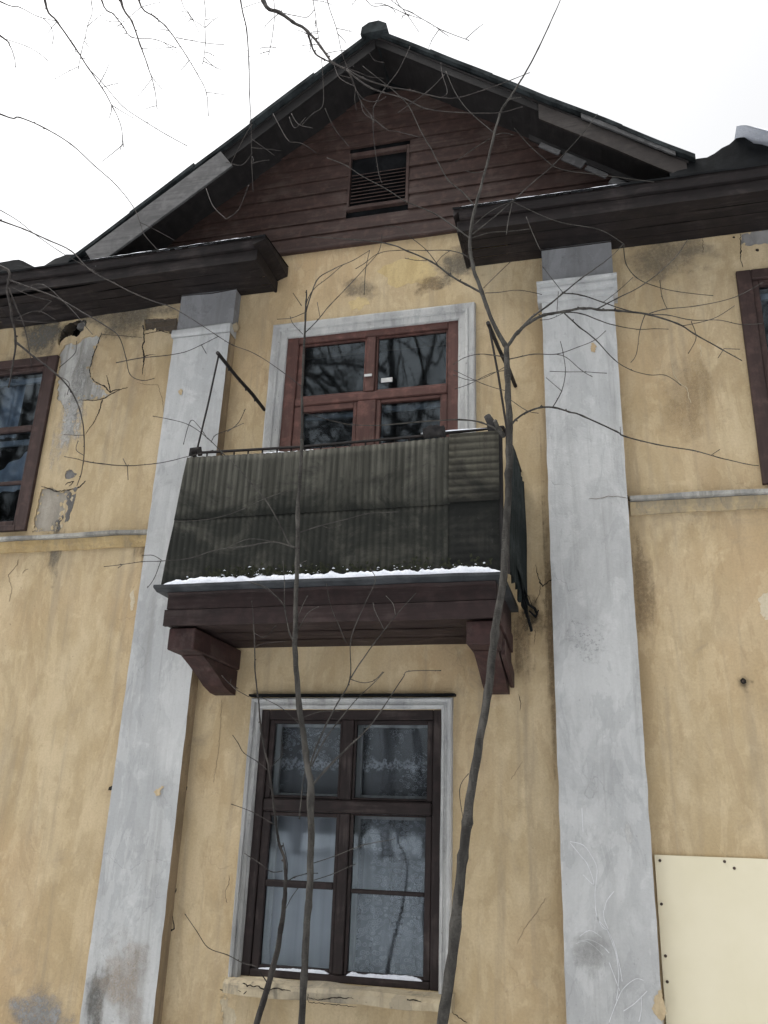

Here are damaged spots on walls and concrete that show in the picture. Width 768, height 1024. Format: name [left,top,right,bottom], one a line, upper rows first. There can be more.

peeling [56,320,108,435]
crack [79,325,171,433]
spalling [32,469,77,534]
water stain [87,952,139,1024]
crack [220,983,353,1007]